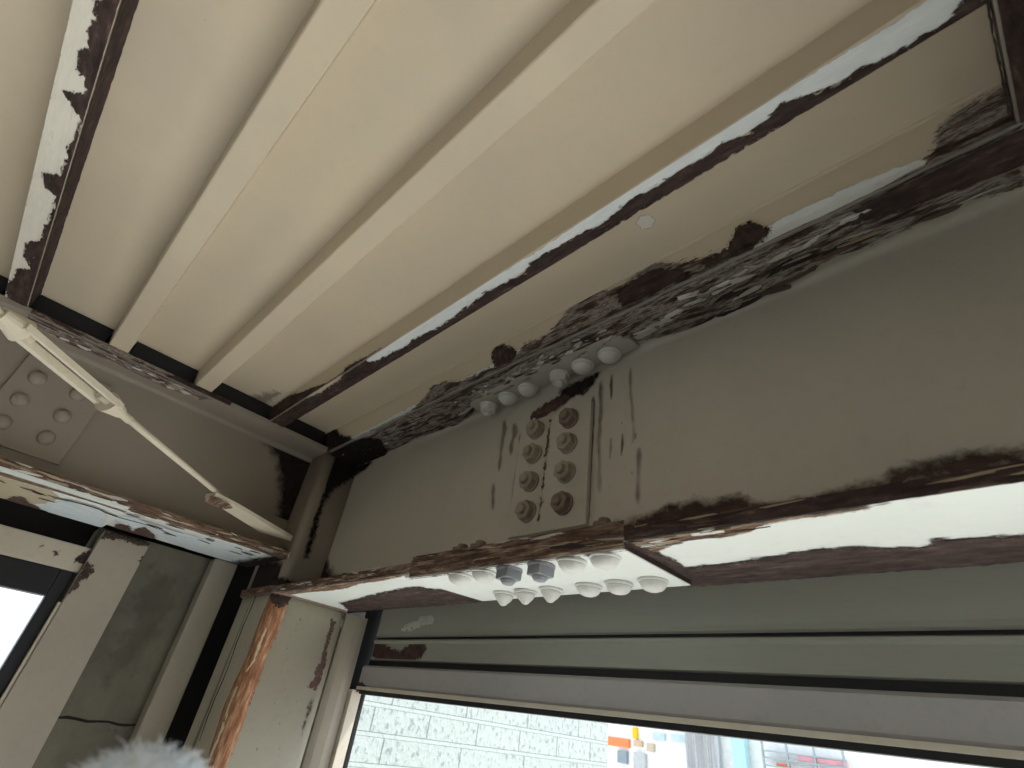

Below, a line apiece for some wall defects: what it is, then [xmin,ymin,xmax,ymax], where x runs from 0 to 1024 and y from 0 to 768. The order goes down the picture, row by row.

peeling [5,0,102,297]
peeling [366,0,965,362]
peeling [343,159,927,455]
corrosion [68,549,94,594]
peeling [0,476,268,563]
corrosion [205,551,446,768]
corrosion [304,458,372,558]
corrosion [530,372,599,521]